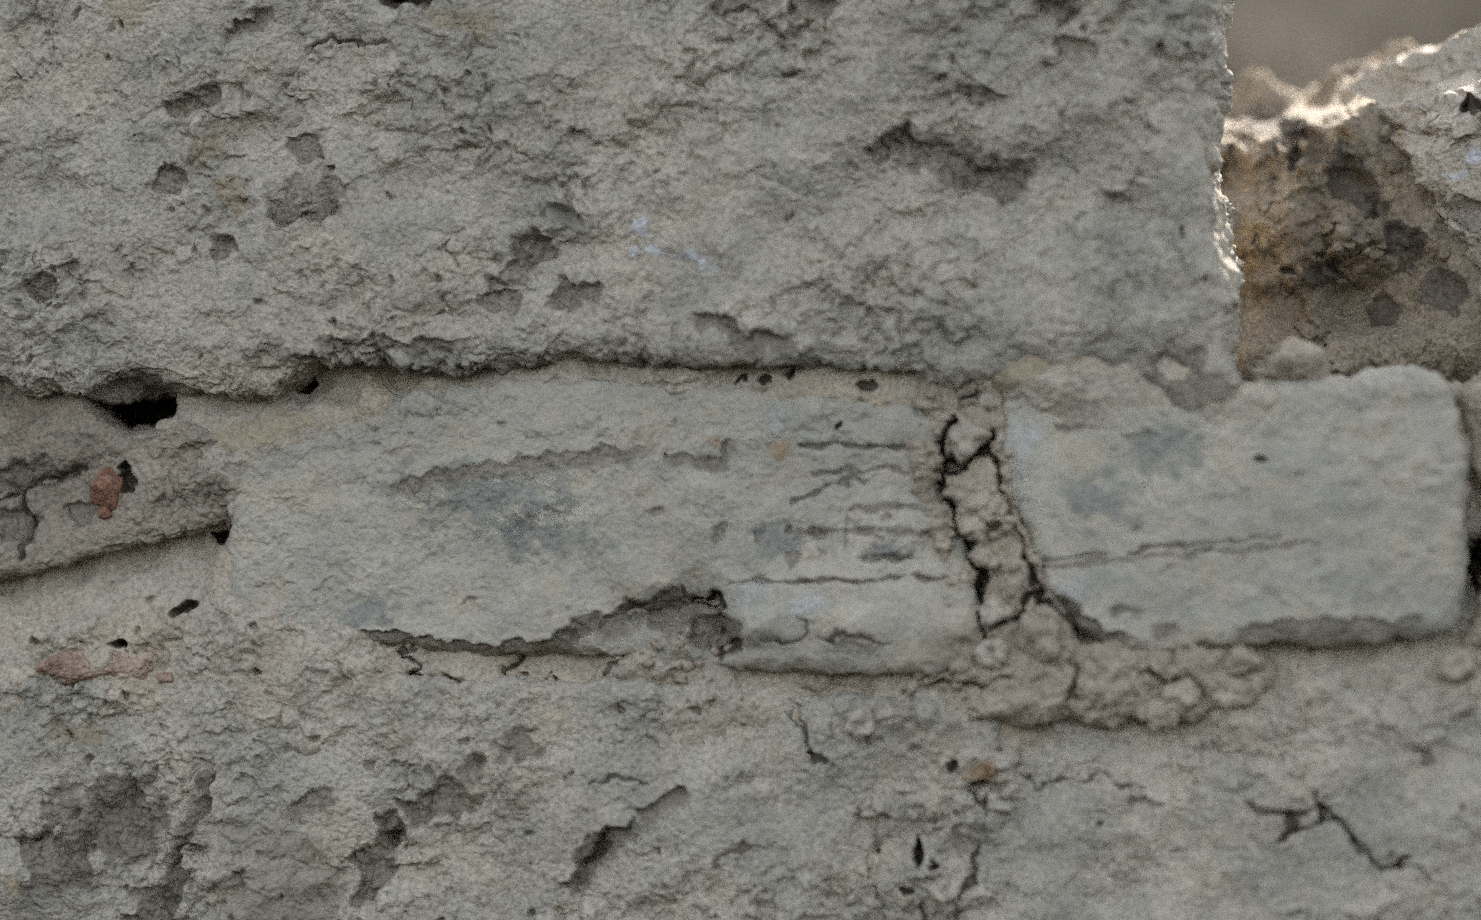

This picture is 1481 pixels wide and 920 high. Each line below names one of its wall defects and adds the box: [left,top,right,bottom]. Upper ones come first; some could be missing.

spalling [1244,108,1468,316]
spalling [1442,195,1481,231]
spalling [1365,291,1402,326]
crack [937,393,1077,640]
crack [932,676,1013,691]
crack [1065,664,1080,701]
crack [1139,667,1210,699]
crack [1246,792,1430,882]